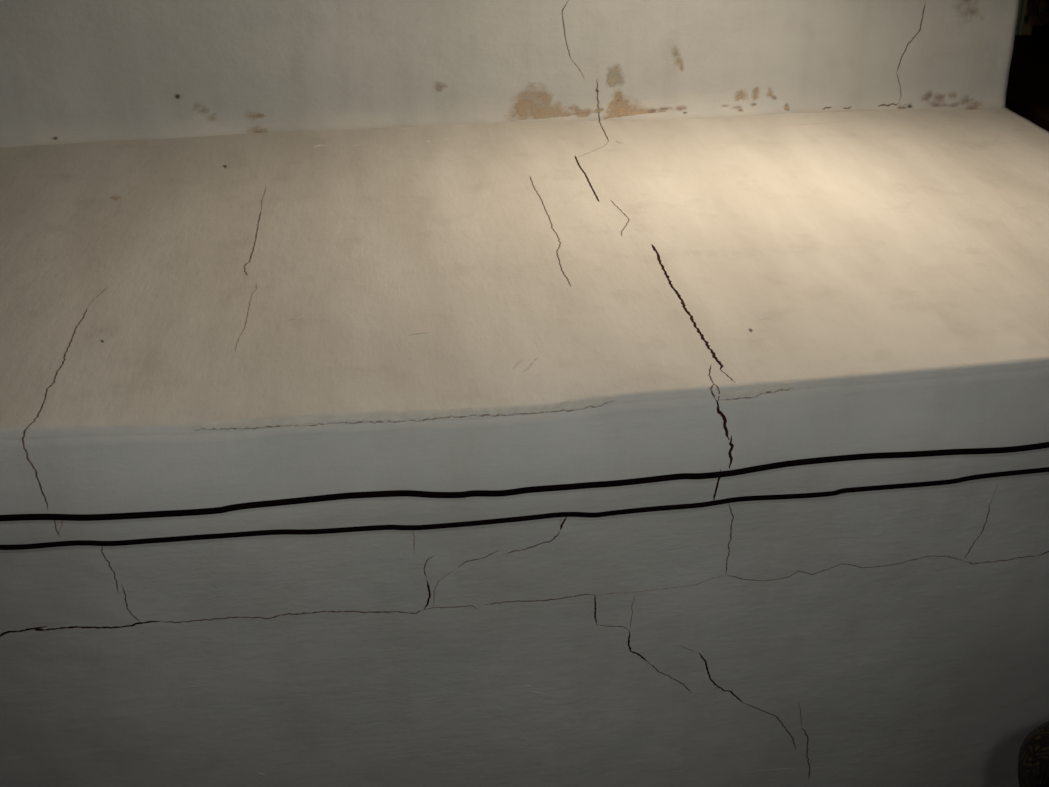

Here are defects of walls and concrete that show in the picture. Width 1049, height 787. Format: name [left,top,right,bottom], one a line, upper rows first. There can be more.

crack [530,177,571,286]
crack [562,1,630,236]
crack [878,2,926,107]
crack [0,244,1049,777]